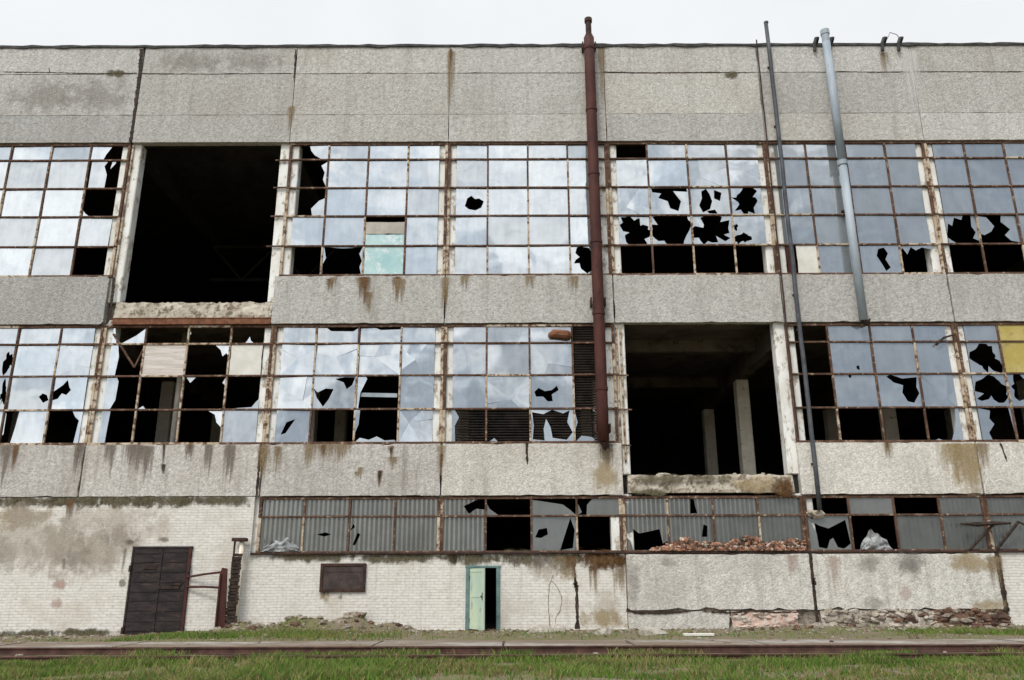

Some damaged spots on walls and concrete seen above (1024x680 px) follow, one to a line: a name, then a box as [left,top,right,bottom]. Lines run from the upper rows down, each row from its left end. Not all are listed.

rust [357,277,372,310]
rust [394,276,405,298]
spalling [113,301,273,318]
rust [0,444,19,484]
rust [258,445,281,475]
rust [378,446,397,483]
leakage [942,443,988,485]
spalling [627,472,795,494]
crack [548,560,580,629]
leakage [584,611,620,626]
spalling [730,611,799,628]
spalling [820,607,1012,628]